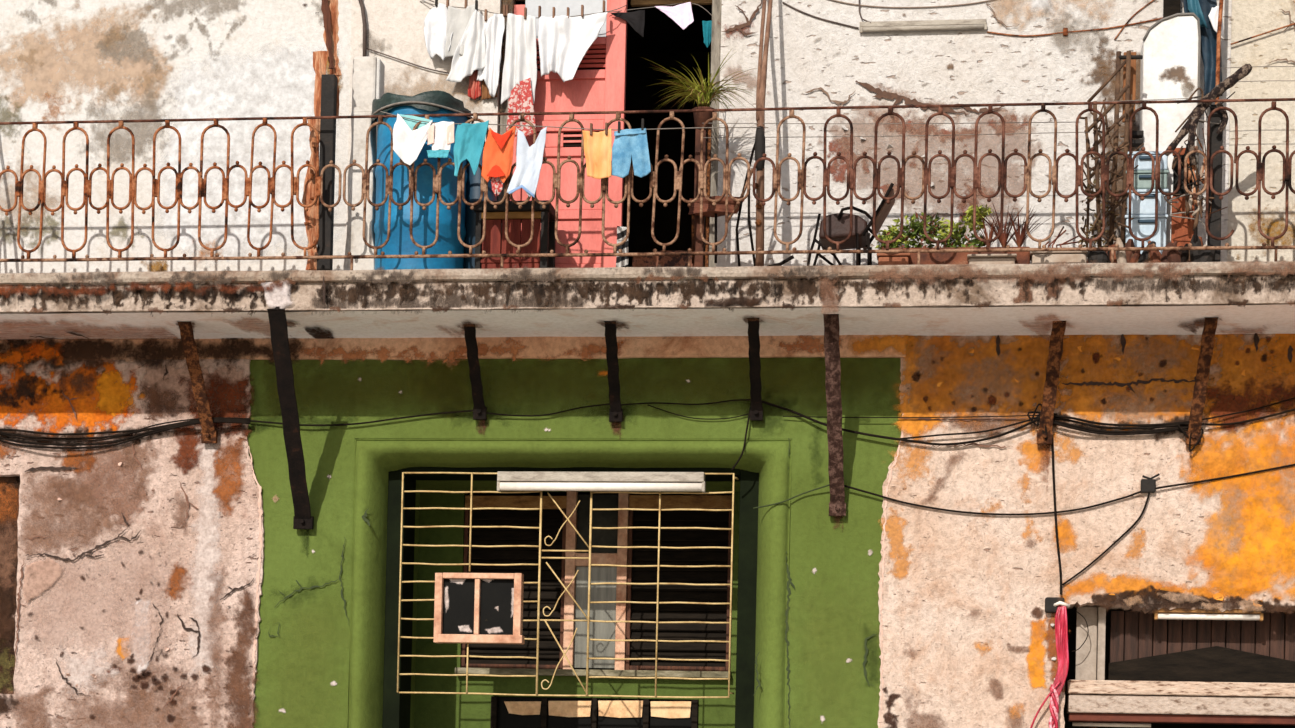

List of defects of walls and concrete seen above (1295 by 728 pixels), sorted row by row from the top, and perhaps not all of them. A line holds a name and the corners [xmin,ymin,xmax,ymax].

water stain [97,28,156,67]
water stain [145,0,245,59]
water stain [1249,213,1295,246]
water stain [312,262,981,314]
water stain [1016,256,1295,302]
rust [1181,318,1263,335]
water stain [0,269,298,728]
peeling [851,334,1295,728]
crack [15,513,141,663]
crack [149,603,200,707]